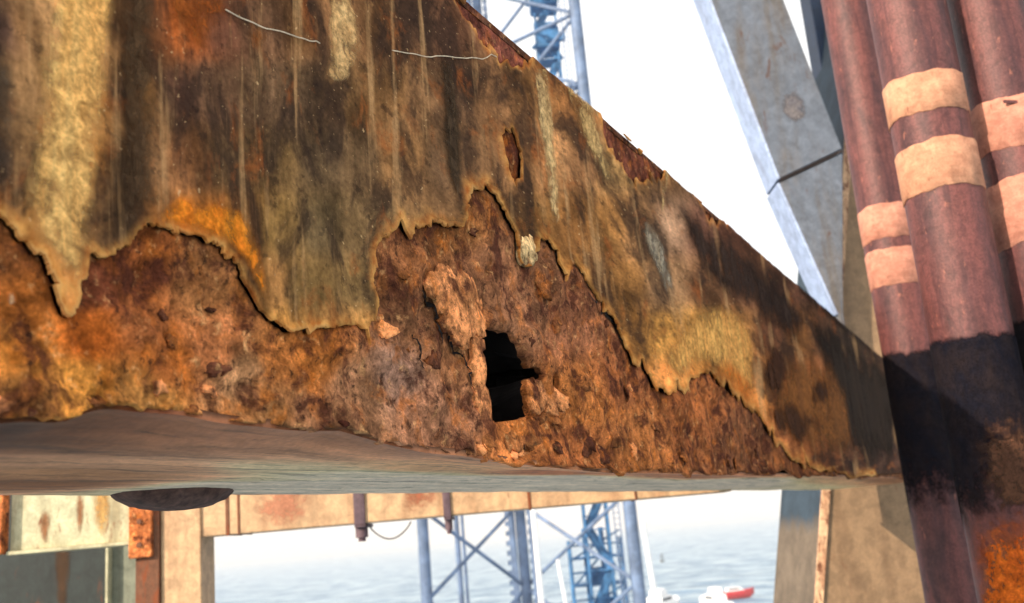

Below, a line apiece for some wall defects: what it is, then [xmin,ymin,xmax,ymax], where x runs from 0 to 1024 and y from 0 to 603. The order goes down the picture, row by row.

spalling [502,130,520,181]
damp [646,232,670,281]
corrosion [0,189,903,480]
damp [669,311,753,387]
corrosion [979,525,1024,603]